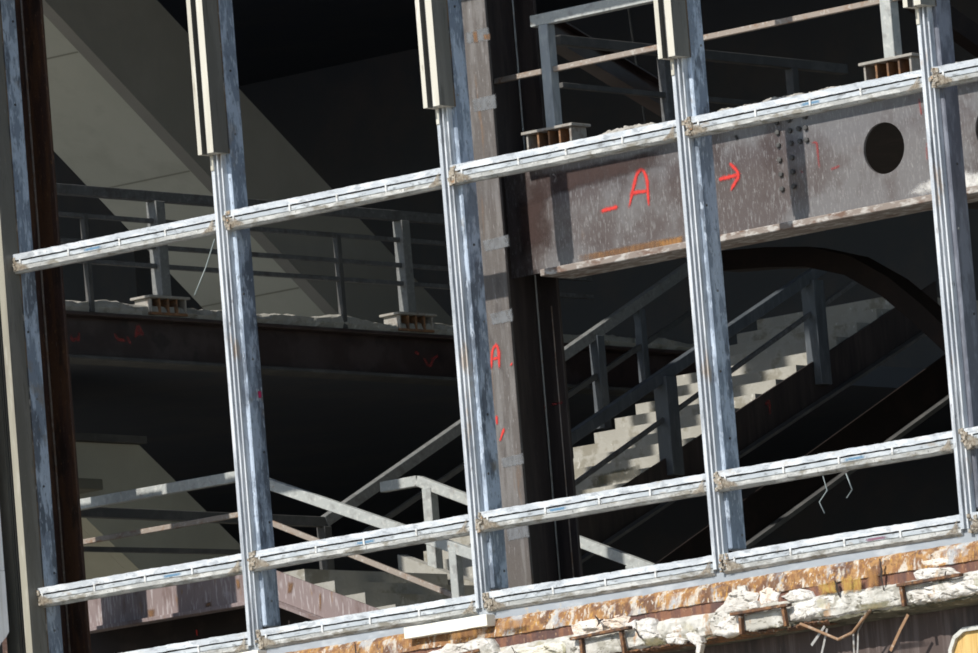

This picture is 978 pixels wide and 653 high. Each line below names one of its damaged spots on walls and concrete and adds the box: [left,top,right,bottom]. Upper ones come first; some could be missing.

corrosion [286,540,978,653]
spalling [429,557,978,653]